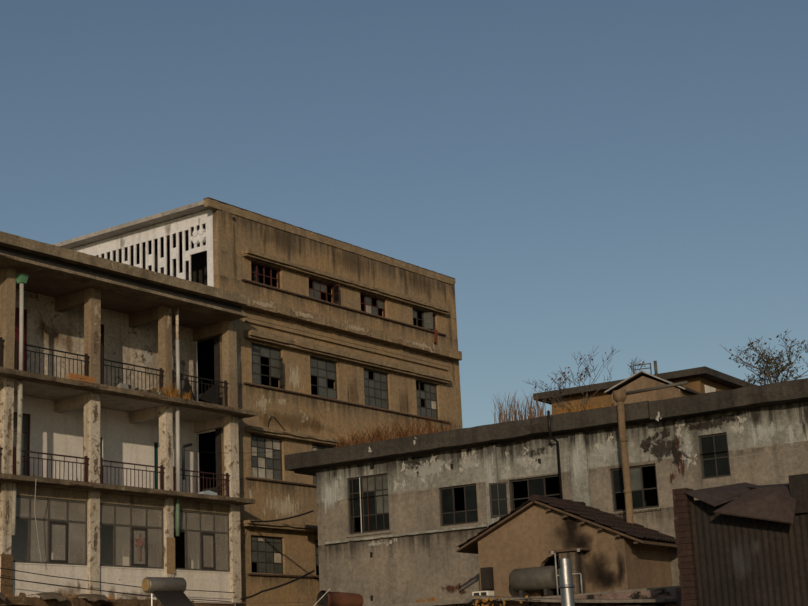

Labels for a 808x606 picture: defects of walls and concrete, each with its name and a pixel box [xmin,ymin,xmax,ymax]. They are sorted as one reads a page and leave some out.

damp [689,414,735,431]
peeling [394,448,481,491]
peeling [504,447,543,474]
damp [640,426,688,464]
spalling [675,419,697,470]